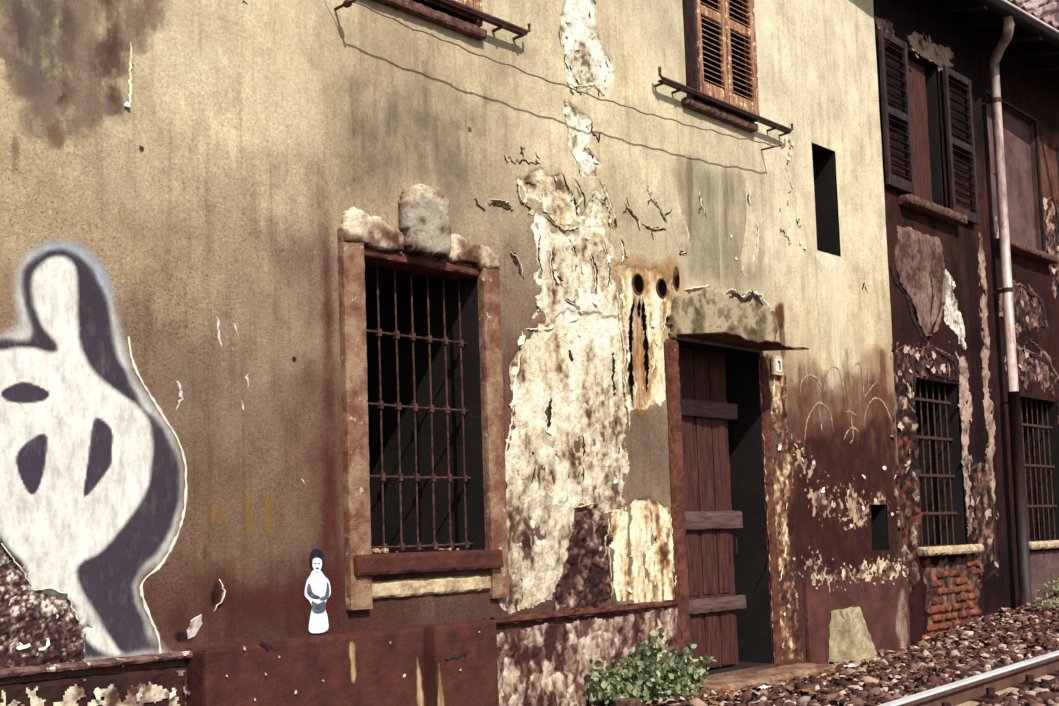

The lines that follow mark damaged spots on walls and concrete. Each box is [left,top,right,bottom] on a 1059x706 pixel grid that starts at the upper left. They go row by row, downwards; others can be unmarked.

leakage [0,0,161,147]
flaking render [474,0,709,617]
corrosion [617,265,650,414]
peeling [724,289,771,310]
flaking render [759,195,1059,661]
flaking render [0,531,190,706]